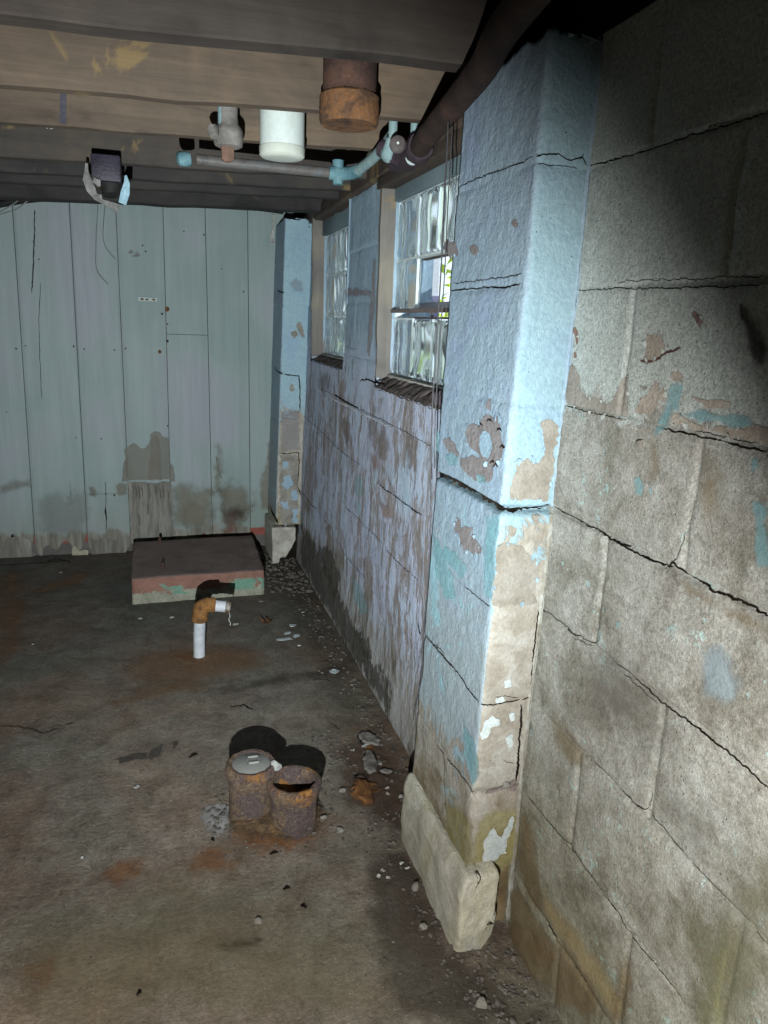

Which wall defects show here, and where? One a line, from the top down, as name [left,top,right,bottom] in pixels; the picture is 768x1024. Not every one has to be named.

crack [458,111,768,189]
crack [451,273,522,291]
crack [579,275,766,296]
peeling [566,327,684,422]
water stain [116,432,249,526]
peeling [279,453,299,526]
peeling [443,399,505,483]
crack [274,366,768,616]
peeling [671,397,768,445]
corrosion [142,651,249,693]
spalling [485,779,516,794]
crack [426,610,768,1017]